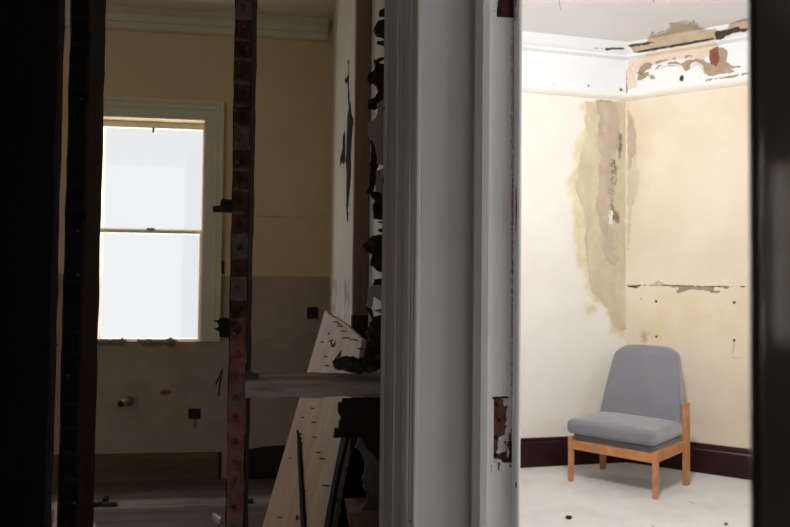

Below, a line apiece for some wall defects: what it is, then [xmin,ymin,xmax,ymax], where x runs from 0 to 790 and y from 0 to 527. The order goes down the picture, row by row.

flaking render [373,8,385,46]
peeling [626,18,748,93]
flaking render [361,57,385,365]
water stain [563,95,750,357]
peeling [493,397,512,463]